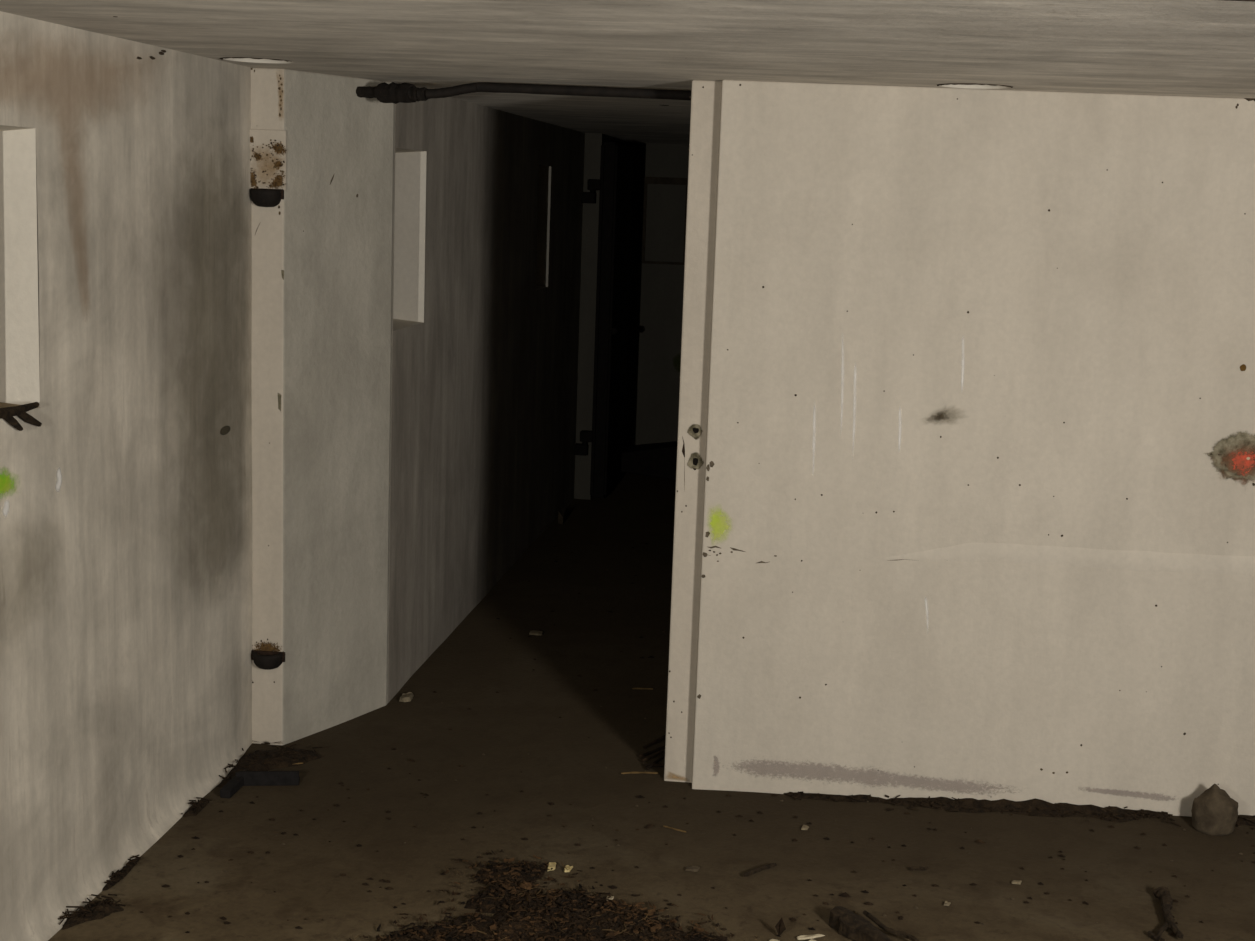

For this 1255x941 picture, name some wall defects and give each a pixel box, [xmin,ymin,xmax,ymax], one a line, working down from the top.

spalling [1207,432,1255,486]